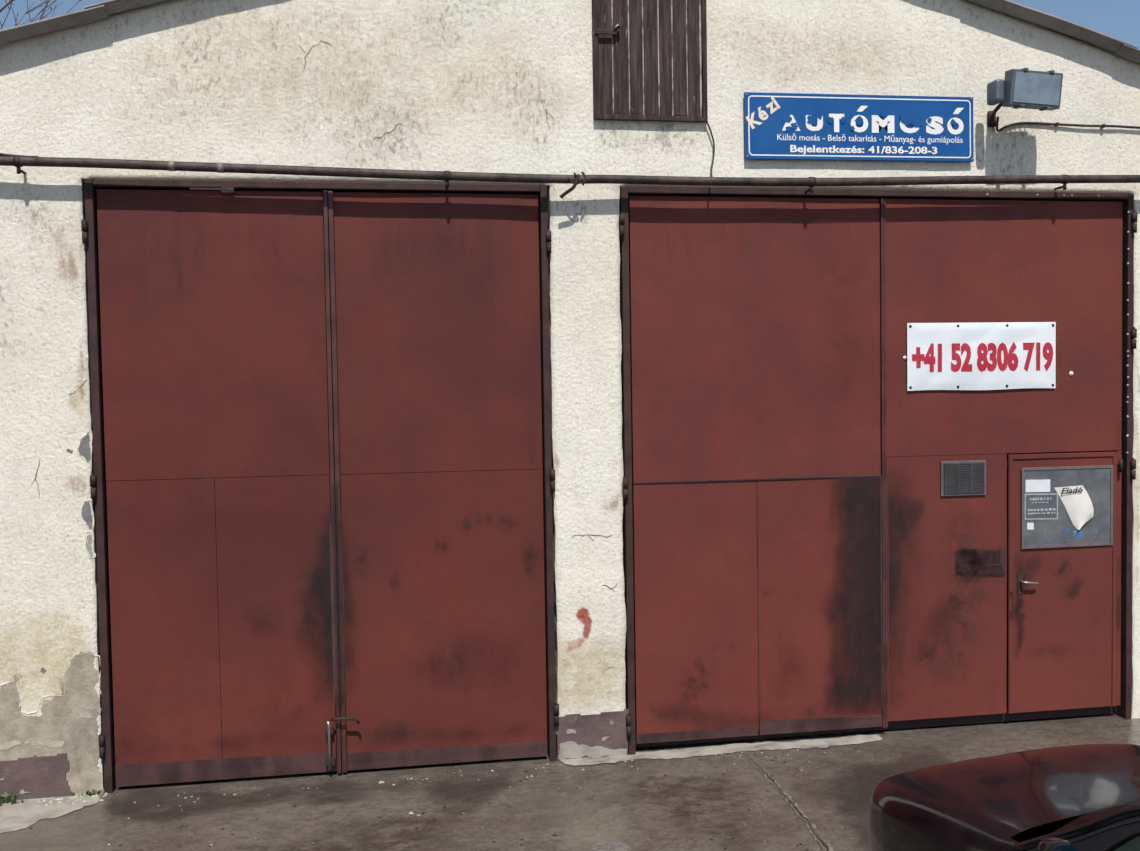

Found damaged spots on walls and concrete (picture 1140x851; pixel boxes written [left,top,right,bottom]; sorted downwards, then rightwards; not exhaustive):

spalling [66,430,93,463]
peeling [0,652,103,795]
peeling [558,721,627,760]